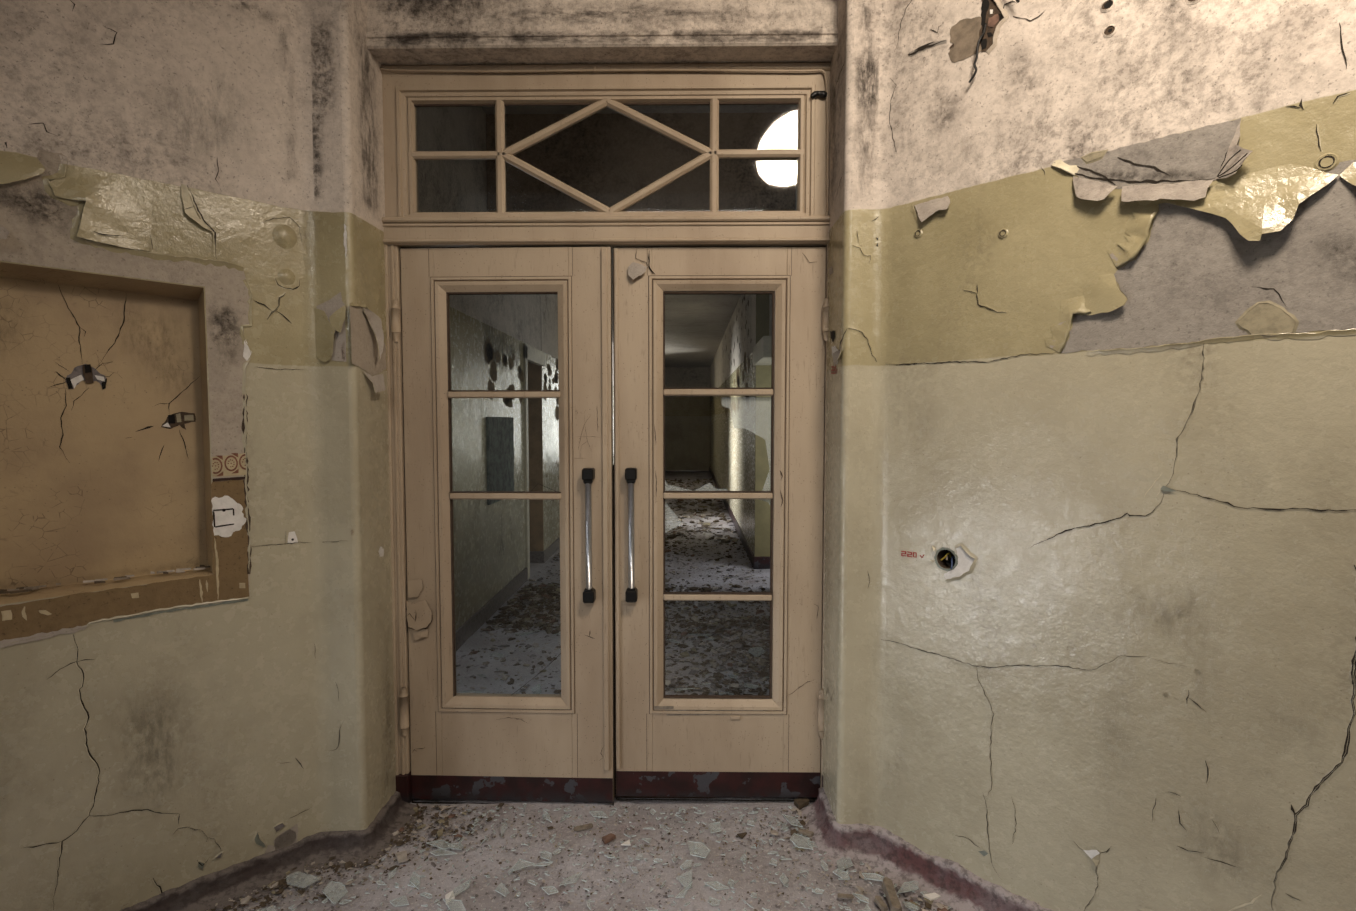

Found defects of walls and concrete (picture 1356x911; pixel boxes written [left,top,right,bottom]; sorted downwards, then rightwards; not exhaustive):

damp [387,33,486,44]
damp [513,33,580,41]
damp [675,30,819,41]
peeling [911,196,951,225]
peeling [1044,118,1356,356]
crack [51,285,126,463]
peeling [0,142,252,645]
peeling [314,292,386,393]
crack [1034,343,1349,545]
crack [24,635,223,910]
crack [881,639,1207,876]
crack [1229,565,1356,911]